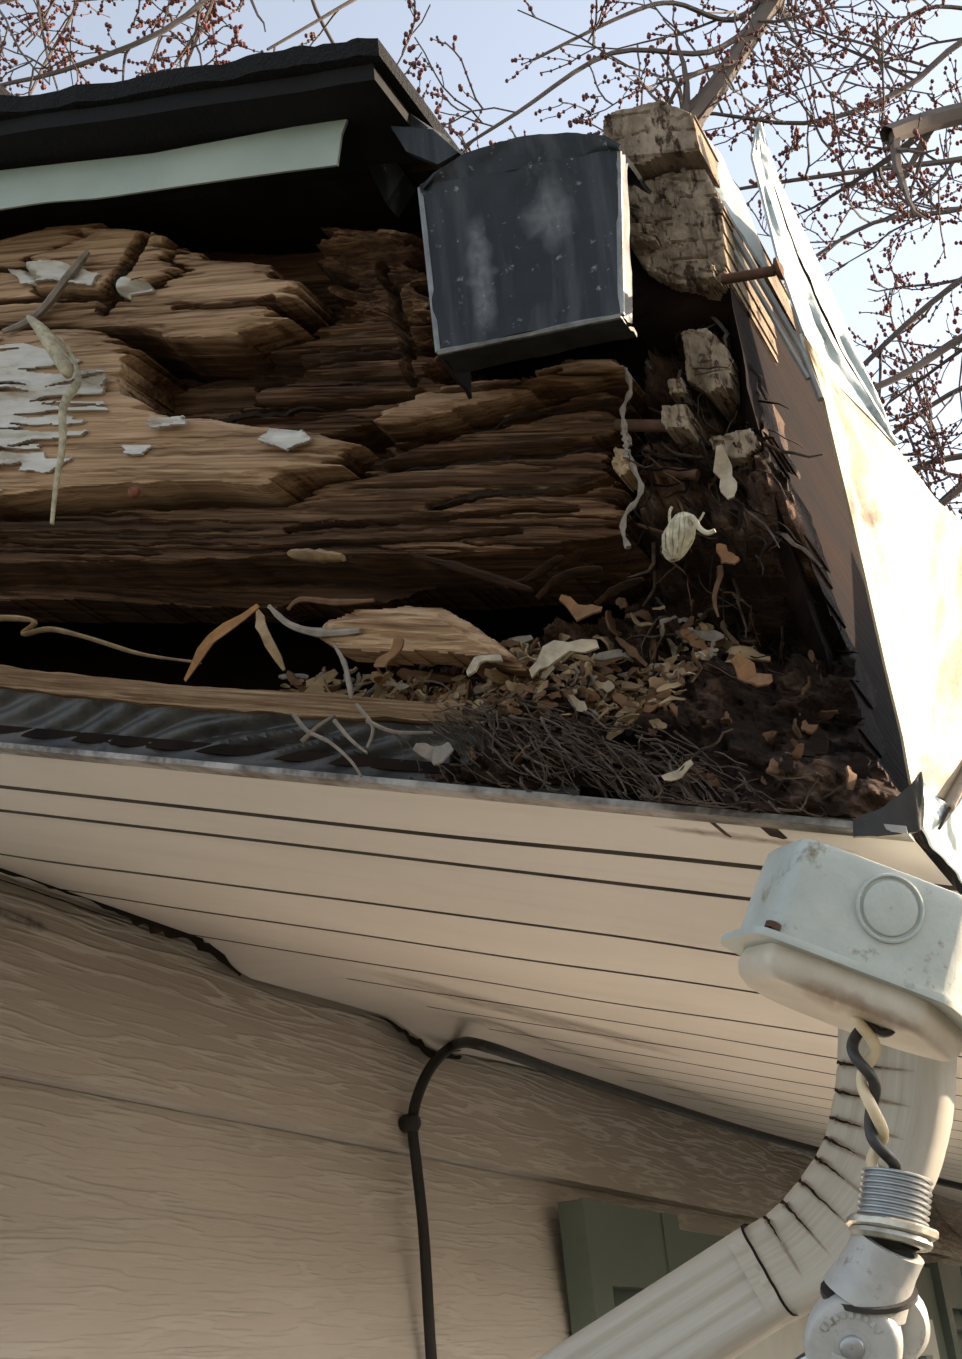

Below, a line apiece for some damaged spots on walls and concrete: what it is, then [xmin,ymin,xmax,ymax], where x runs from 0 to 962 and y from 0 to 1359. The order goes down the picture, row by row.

peeling [8,260,102,287]
crack [94,245,143,312]
peeling [116,277,155,301]
peeling [0,337,110,474]
peeling [145,415,187,429]
crack [218,406,331,422]
peeling [122,445,153,456]
peeling [258,428,312,451]
crack [403,439,608,507]
crack [0,868,241,976]
crack [379,1017,462,1059]